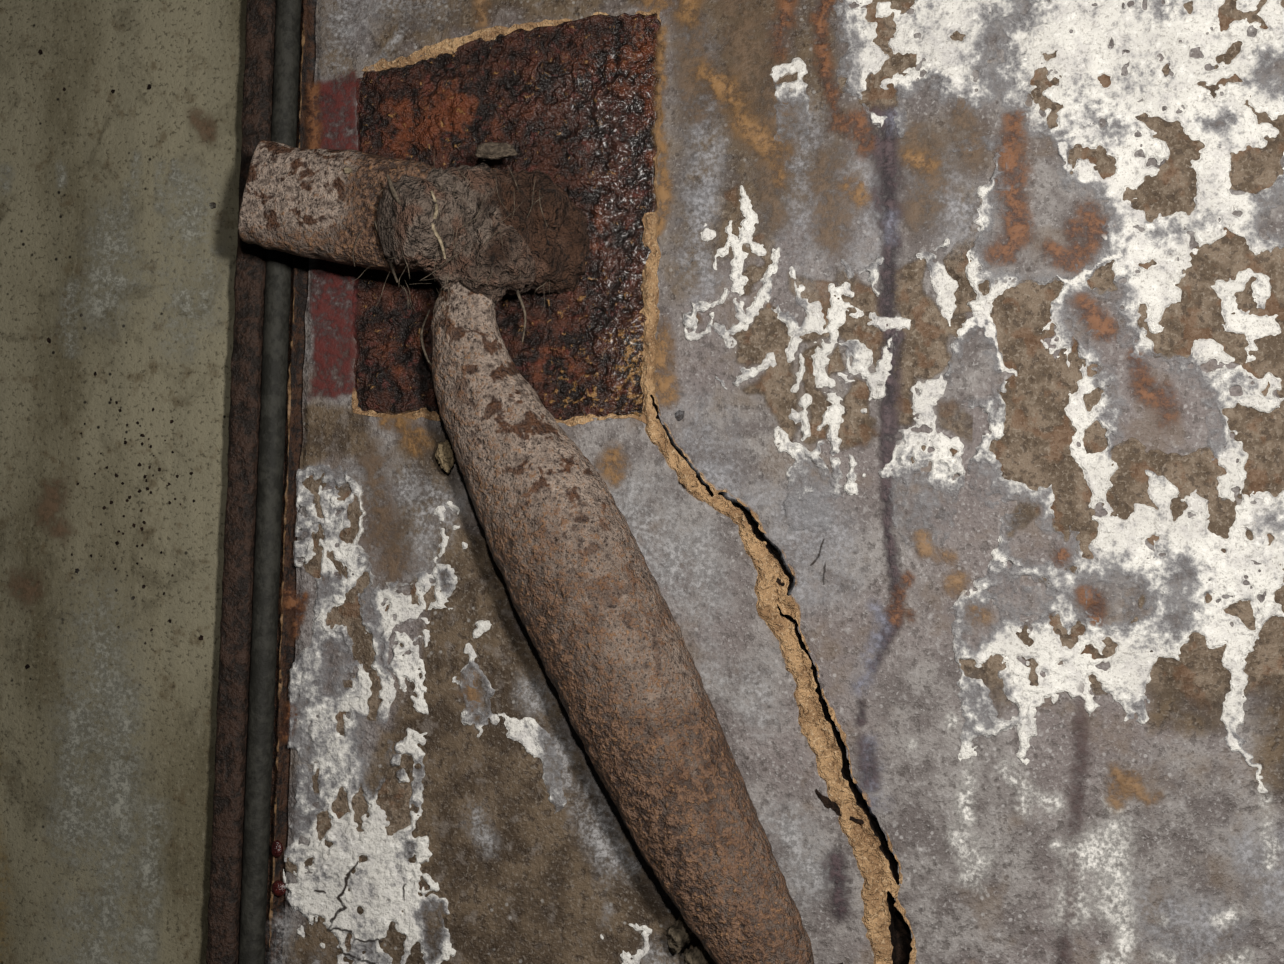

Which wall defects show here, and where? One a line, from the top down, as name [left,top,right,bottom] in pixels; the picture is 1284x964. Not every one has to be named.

corrosion [988,112,1107,272]
peeling [682,0,1284,793]
corrosion [1076,294,1117,340]
corrosion [1128,351,1176,421]
crack [640,212,917,964]
peeling [283,465,468,964]
peeling [620,923,652,964]